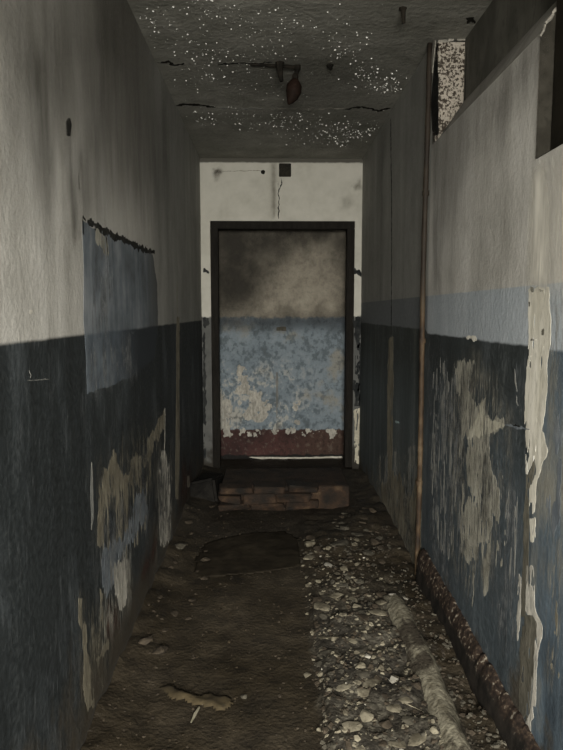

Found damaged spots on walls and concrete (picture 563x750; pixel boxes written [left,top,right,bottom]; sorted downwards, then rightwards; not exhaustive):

crack [176,101,216,109]
crack [345,106,391,146]
peeling [95,228,109,256]
crack [387,171,395,333]
peeling [220,365,337,439]
peeling [78,307,190,711]
peeling [430,286,563,731]